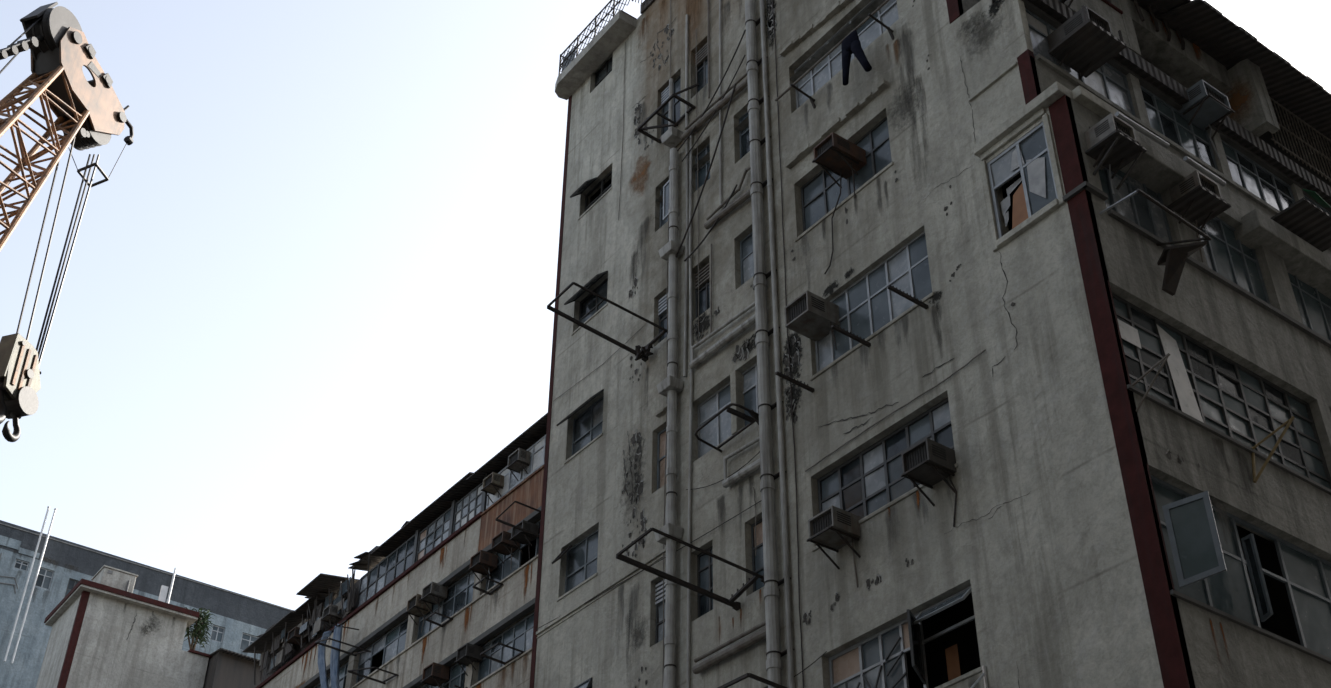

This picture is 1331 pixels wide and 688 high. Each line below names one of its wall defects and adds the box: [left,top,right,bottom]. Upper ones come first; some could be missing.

water stain [964,0,1004,44]
rust [631,157,650,192]
crack [992,252,1018,374]
crack [821,402,898,434]
spalling [622,432,647,565]